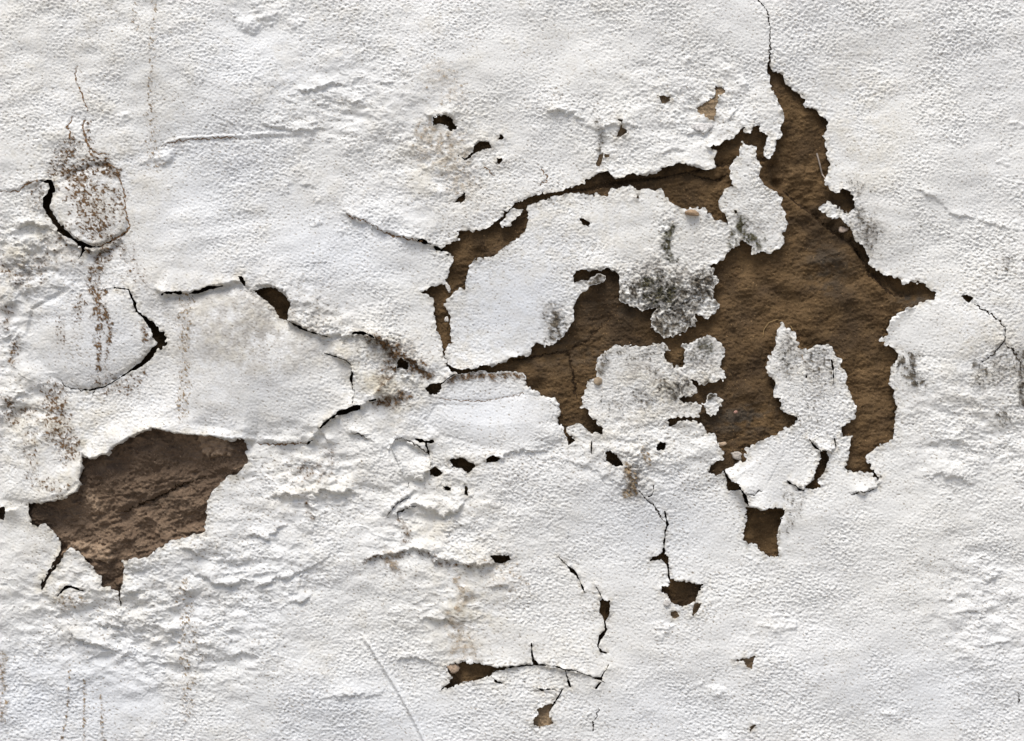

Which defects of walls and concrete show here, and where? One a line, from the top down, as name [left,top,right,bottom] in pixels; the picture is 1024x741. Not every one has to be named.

crack [0,66,130,259]
crack [61,287,167,393]
peeling [238,276,290,322]
peeling [421,63,936,557]
crack [977,305,1022,368]
peeling [0,428,248,608]
peeling [490,555,511,564]
crack [639,485,670,580]
peeling [441,661,510,690]
peeling [533,703,553,728]
crack [490,557,609,731]
peeling [599,600,610,621]